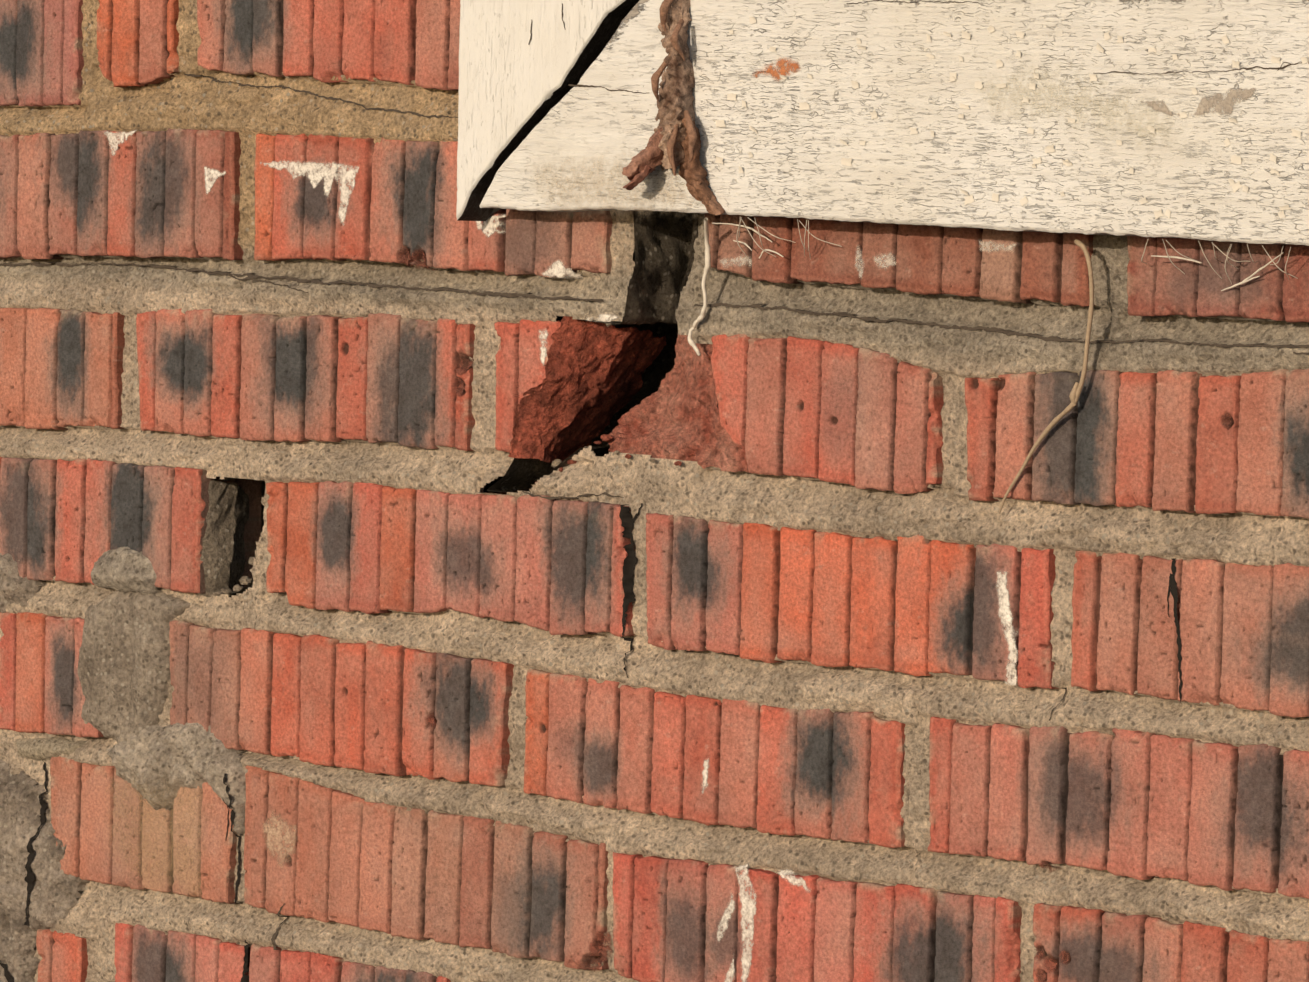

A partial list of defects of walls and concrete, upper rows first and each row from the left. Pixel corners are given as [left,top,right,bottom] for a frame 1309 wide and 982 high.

peeling [1141,87,1255,123]
spalling [509,316,748,472]
crack [0,211,1309,678]
crack [24,757,48,926]
crack [0,963,14,982]
crack [240,904,290,982]